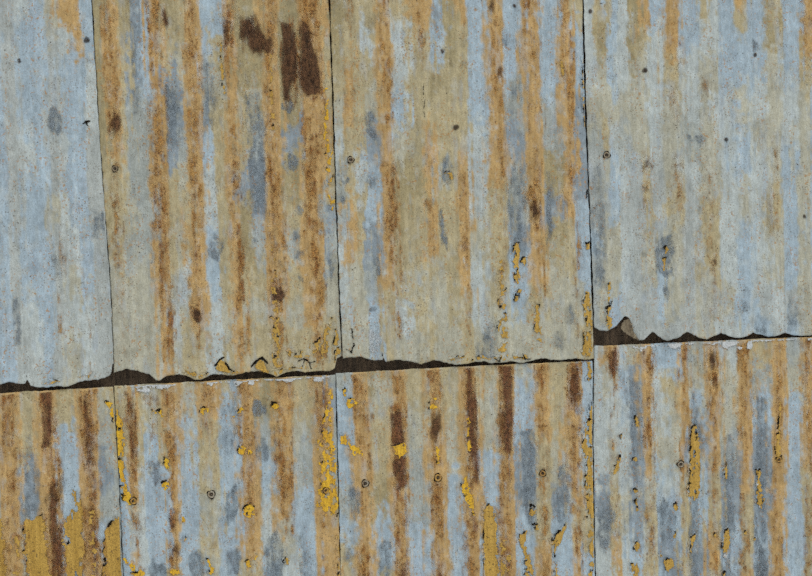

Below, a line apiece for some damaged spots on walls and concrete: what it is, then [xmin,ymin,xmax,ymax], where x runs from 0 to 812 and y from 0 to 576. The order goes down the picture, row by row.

corrosion [223,0,325,107]
corrosion [149,101,177,362]
corrosion [263,143,287,312]
corrosion [301,118,327,364]
peeling [448,240,529,361]
peeling [104,399,139,505]
peeling [182,244,363,520]
corrosion [391,375,410,505]
corrosion [497,366,514,452]
peeling [685,423,701,500]
peeling [60,487,145,576]
peeling [460,476,539,576]